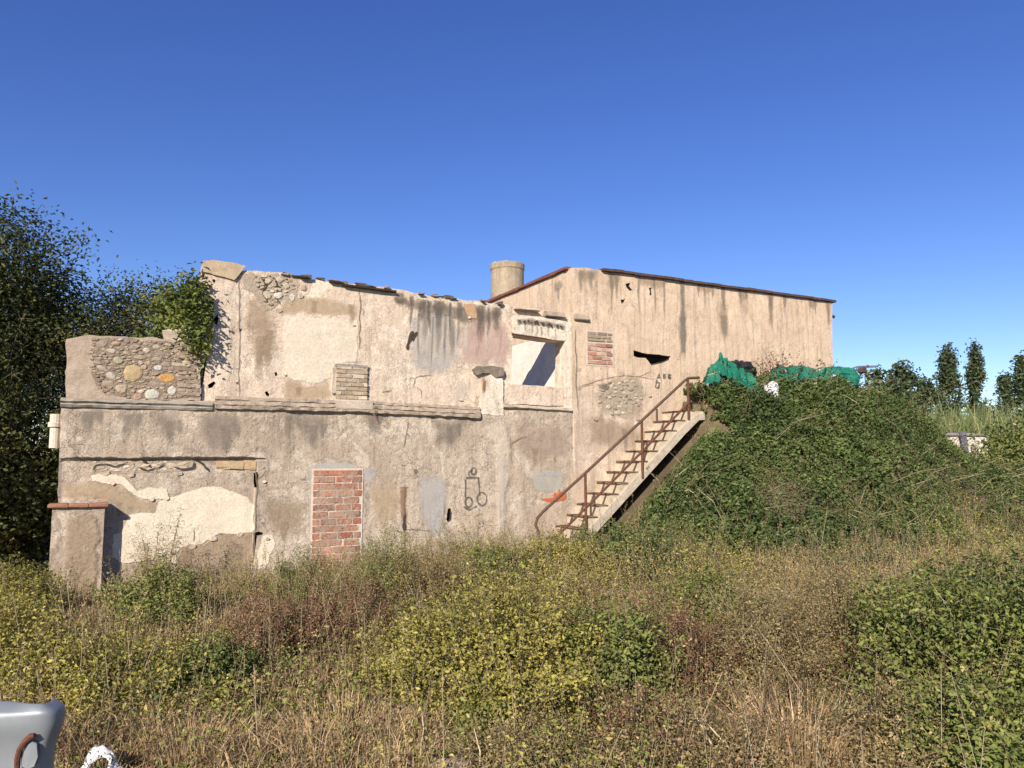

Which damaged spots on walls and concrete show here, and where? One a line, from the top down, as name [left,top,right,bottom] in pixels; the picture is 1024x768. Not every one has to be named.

crack [236,283,244,393]
flaking render [240,272,358,384]
crack [357,293,365,349]
damp [394,293,507,371]
spalling [594,376,652,421]
flaking render [85,460,275,572]